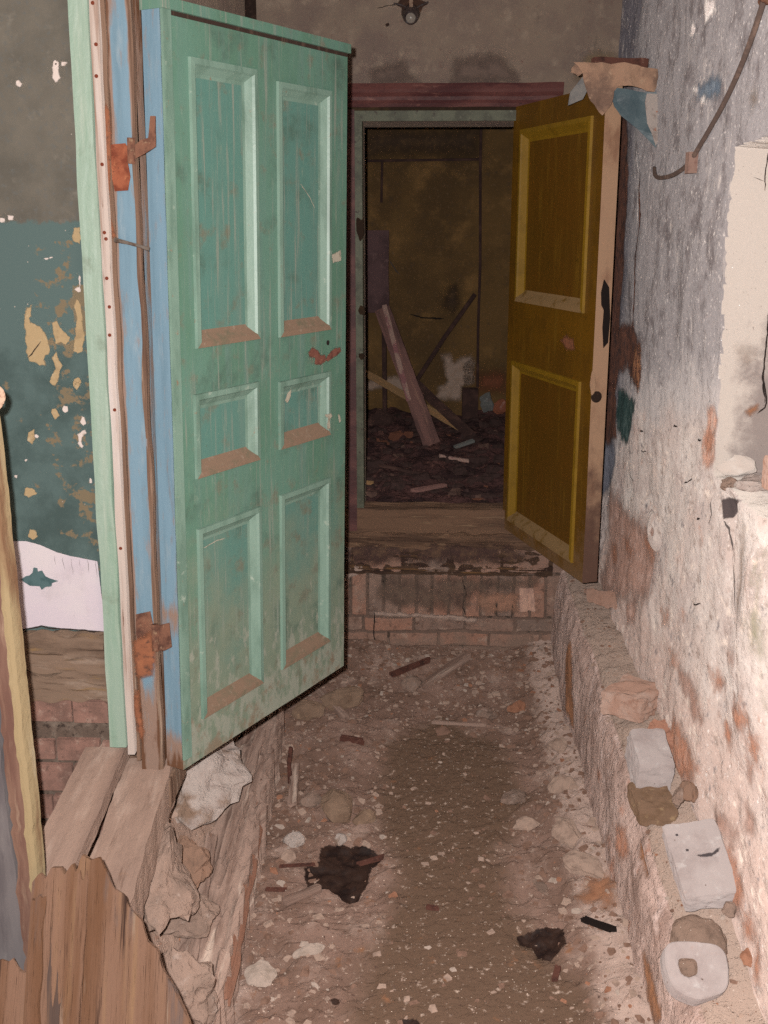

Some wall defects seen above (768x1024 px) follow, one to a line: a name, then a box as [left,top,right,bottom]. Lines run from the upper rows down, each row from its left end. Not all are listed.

flaking render [52,60,67,82]
peeling [72,228,81,244]
peeling [24,276,85,385]
flaking render [698,408,717,467]
peeling [13,529,108,703]
corrosion [134,634,155,678]
corrosion [134,691,144,738]